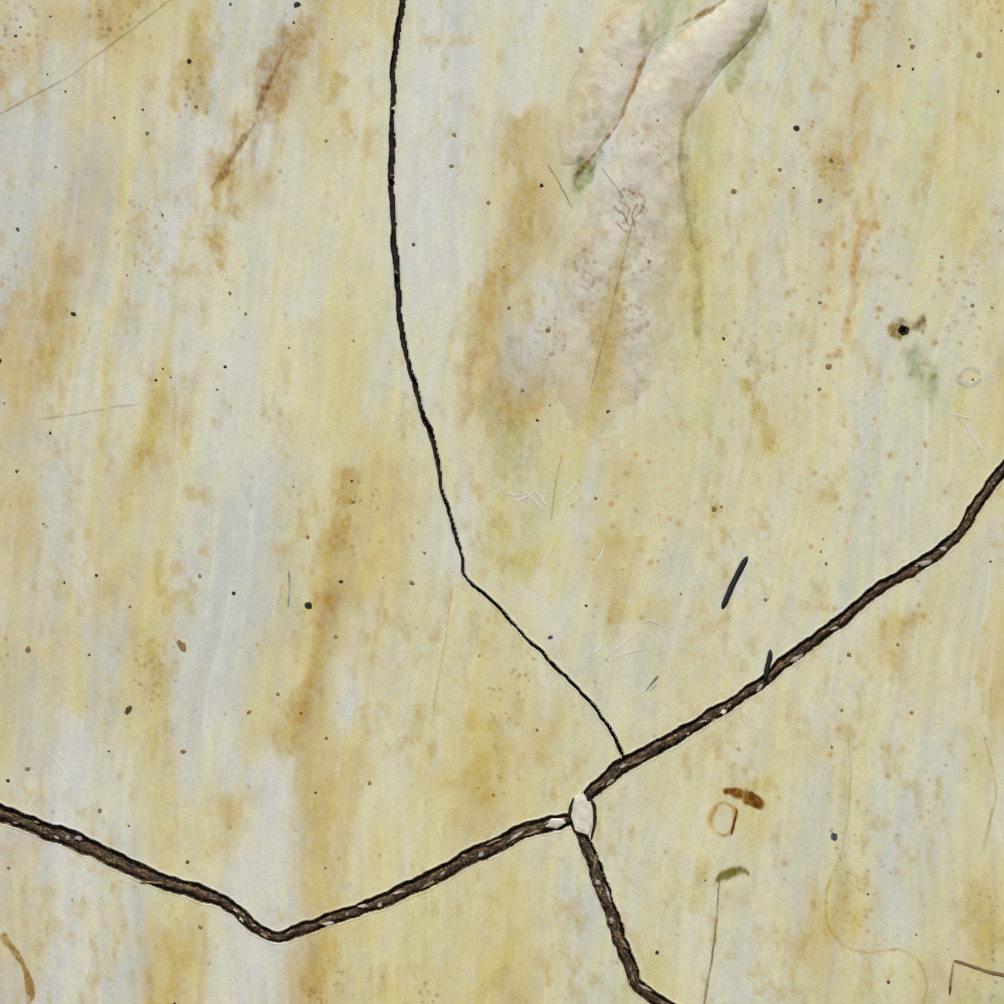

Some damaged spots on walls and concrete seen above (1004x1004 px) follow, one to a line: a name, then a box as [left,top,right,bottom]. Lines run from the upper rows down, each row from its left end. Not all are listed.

crack [386,0,1004,840]
crack [0,797,681,1004]
corrosion [724,788,763,834]
crack [949,960,1004,995]